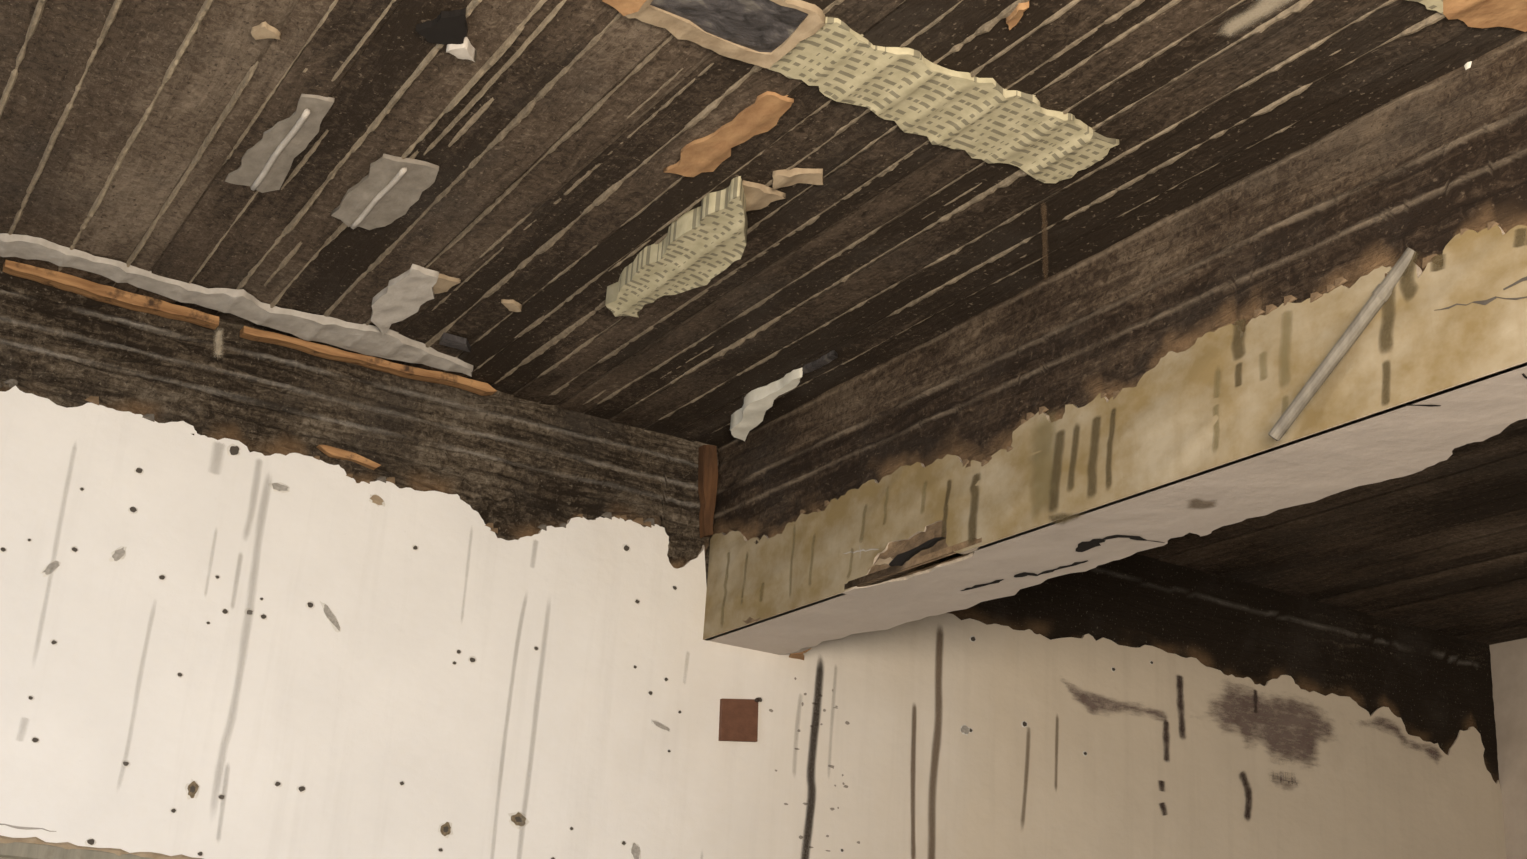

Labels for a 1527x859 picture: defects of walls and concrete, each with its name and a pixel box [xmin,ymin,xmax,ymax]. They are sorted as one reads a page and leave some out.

flaking render [0,31,1527,569]
flaking render [844,521,982,590]
flaking render [948,554,1500,783]
crack [0,823,56,832]
water stain [784,662,850,859]
water stain [1070,676,1185,761]
water stain [1240,772,1252,819]
water stain [1215,688,1330,761]